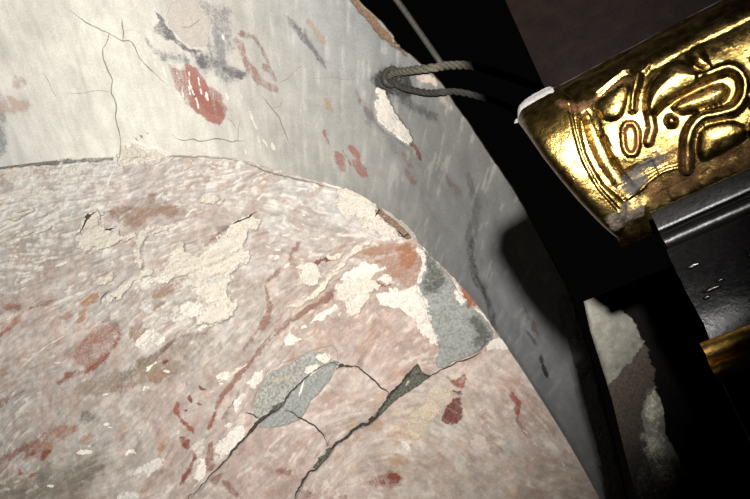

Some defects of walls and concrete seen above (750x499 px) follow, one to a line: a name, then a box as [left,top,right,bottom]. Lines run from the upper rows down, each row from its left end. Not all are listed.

crack [0,9,168,169]
flaking render [116,133,170,167]
peeling [374,87,421,160]
flaking render [77,209,262,348]
flaking render [266,188,439,346]
peeling [453,277,511,353]
crack [187,345,482,499]